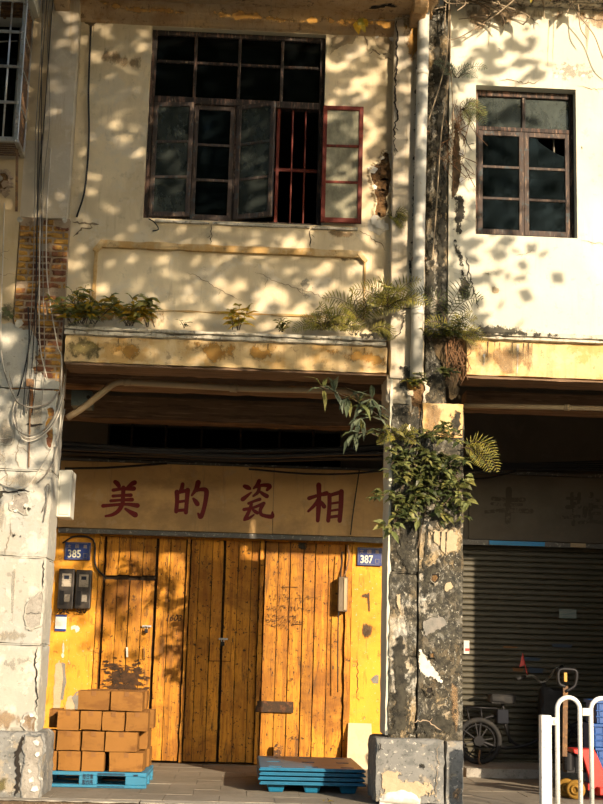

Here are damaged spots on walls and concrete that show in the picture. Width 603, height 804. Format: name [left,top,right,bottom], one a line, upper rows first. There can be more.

leakage [468,5,539,30]
crack [364,3,400,155]
spalling [367,150,392,235]
leakage [424,17,475,330]
spalling [9,217,71,395]
leakage [194,342,235,363]
leakage [399,366,411,391]
leakage [397,405,461,455]
peeling [431,529,459,554]
peeling [423,615,447,636]
peeling [418,649,458,725]
crack [13,736,25,797]